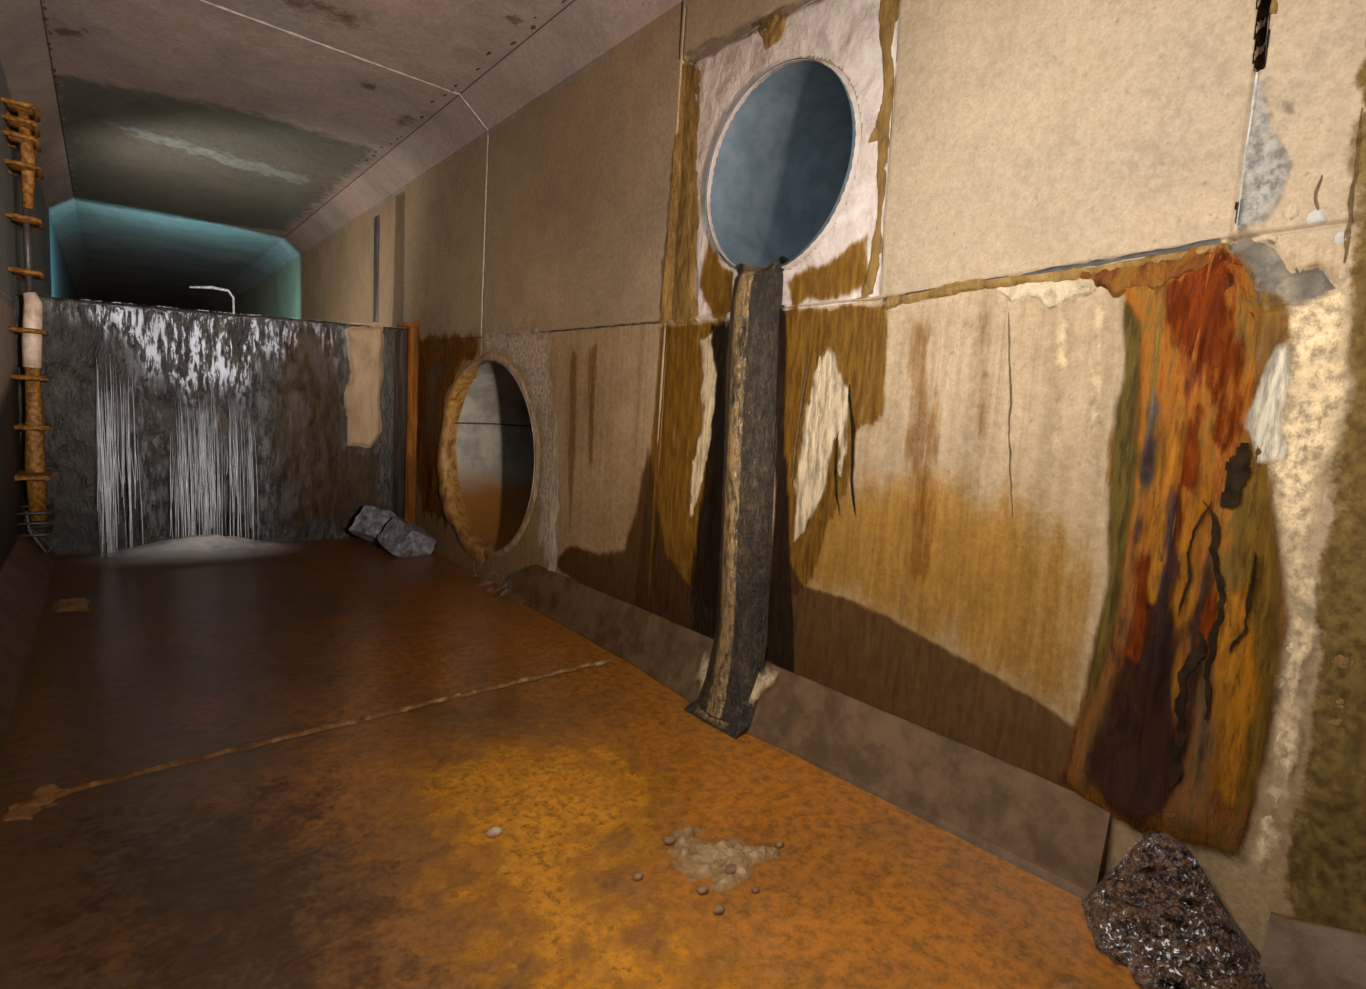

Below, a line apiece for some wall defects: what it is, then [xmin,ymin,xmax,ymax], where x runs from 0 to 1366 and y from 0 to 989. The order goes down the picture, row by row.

crack [1252,0,1278,72]
crack [1234,201,1243,225]
leakage [0,374,24,566]
peeling [482,325,560,573]
spalling [659,0,1354,870]
rust [1058,246,1289,856]
crack [1167,443,1257,792]
leakage [1285,111,1366,934]